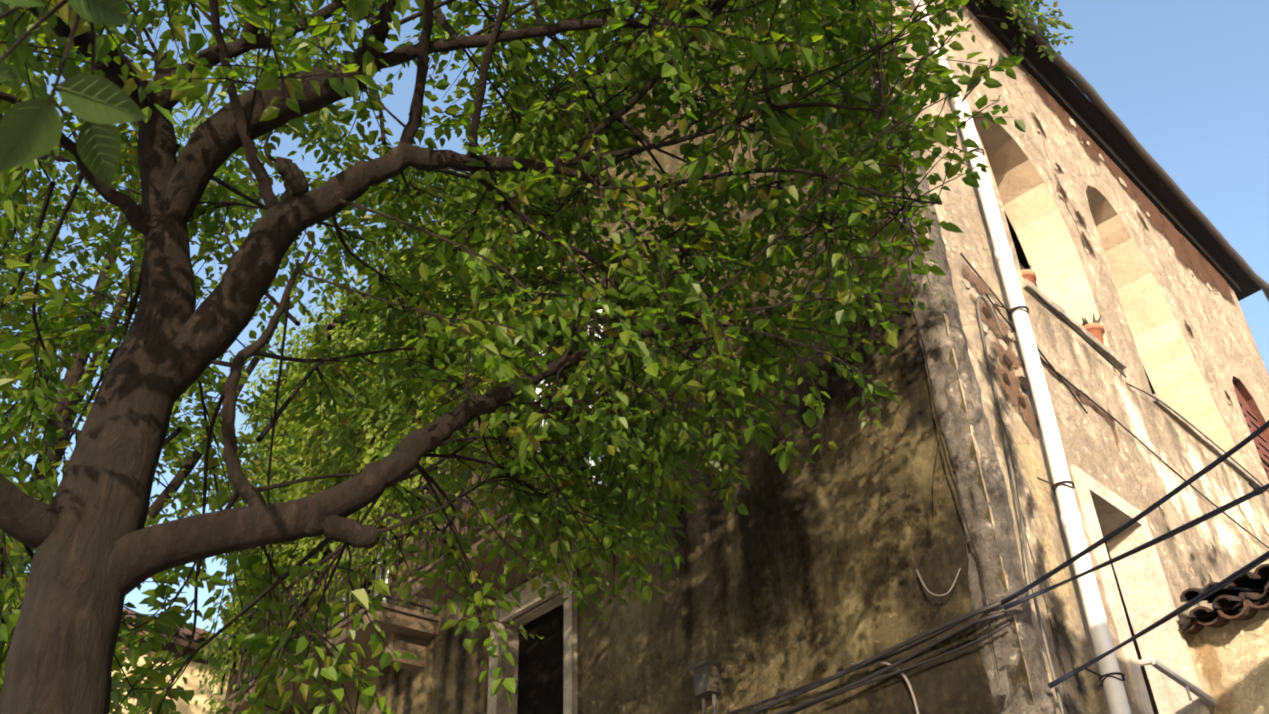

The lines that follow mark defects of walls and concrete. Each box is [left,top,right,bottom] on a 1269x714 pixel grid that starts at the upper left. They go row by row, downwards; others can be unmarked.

water stain [707,441,816,641]
water stain [801,282,938,447]
water stain [827,513,1027,714]
spalling [962,263,1100,714]
spalling [1040,357,1114,426]